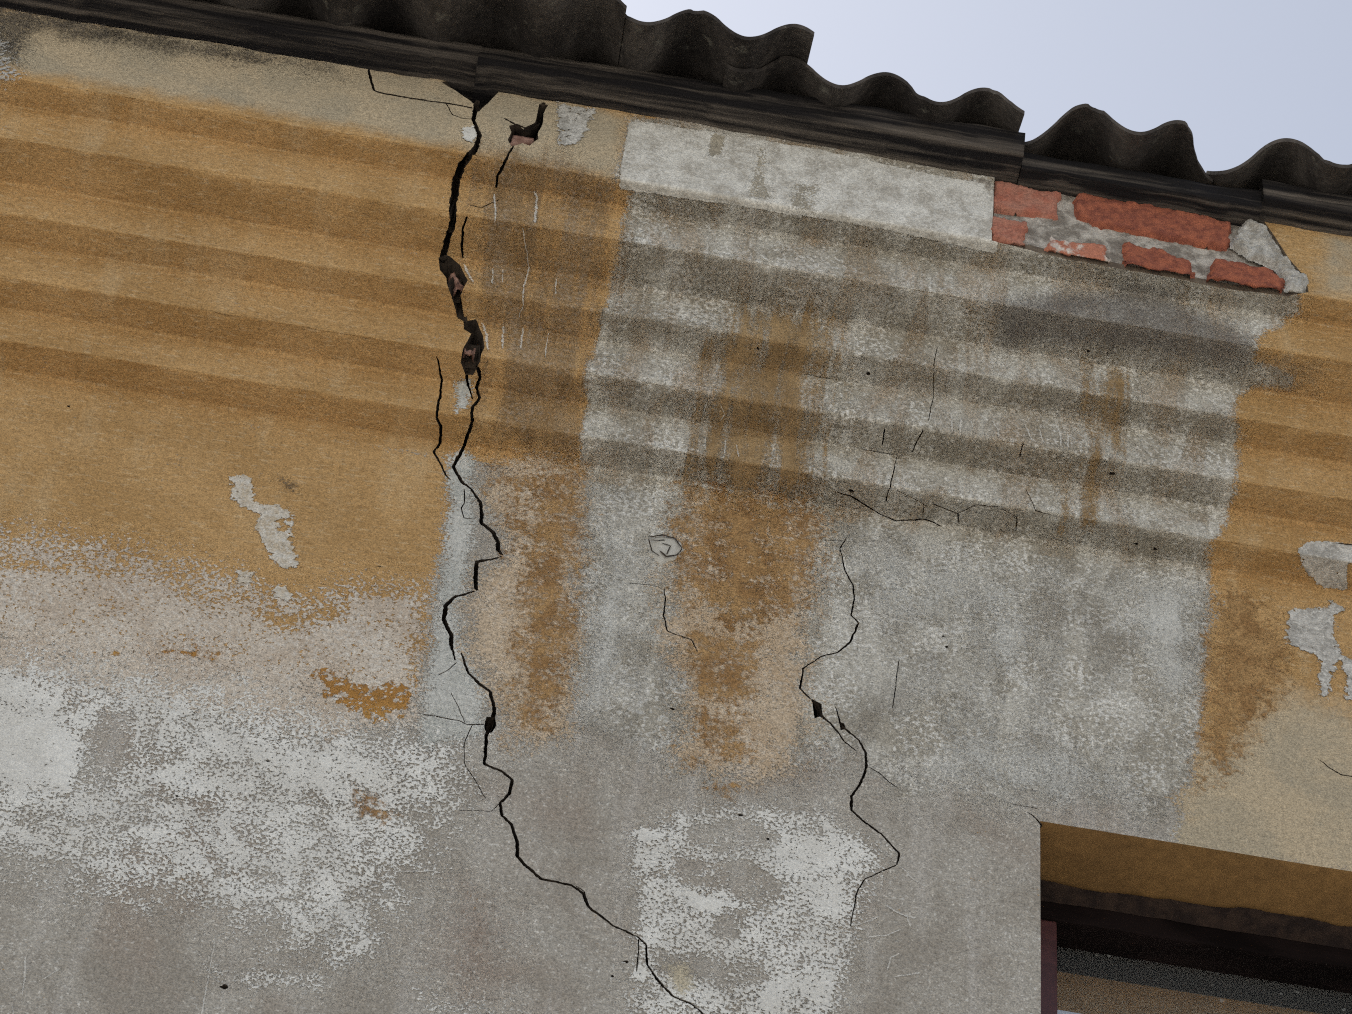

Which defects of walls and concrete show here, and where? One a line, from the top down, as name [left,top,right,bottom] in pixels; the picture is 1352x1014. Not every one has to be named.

peeling [555,101,596,147]
peeling [619,121,1309,296]
peeling [0,474,442,749]
water stain [0,445,497,1000]
crack [369,73,703,1014]
crack [799,537,925,977]
water stain [453,117,1300,1014]
crack [835,349,1050,530]
peeling [1284,541,1352,700]
water stain [396,981,525,1014]